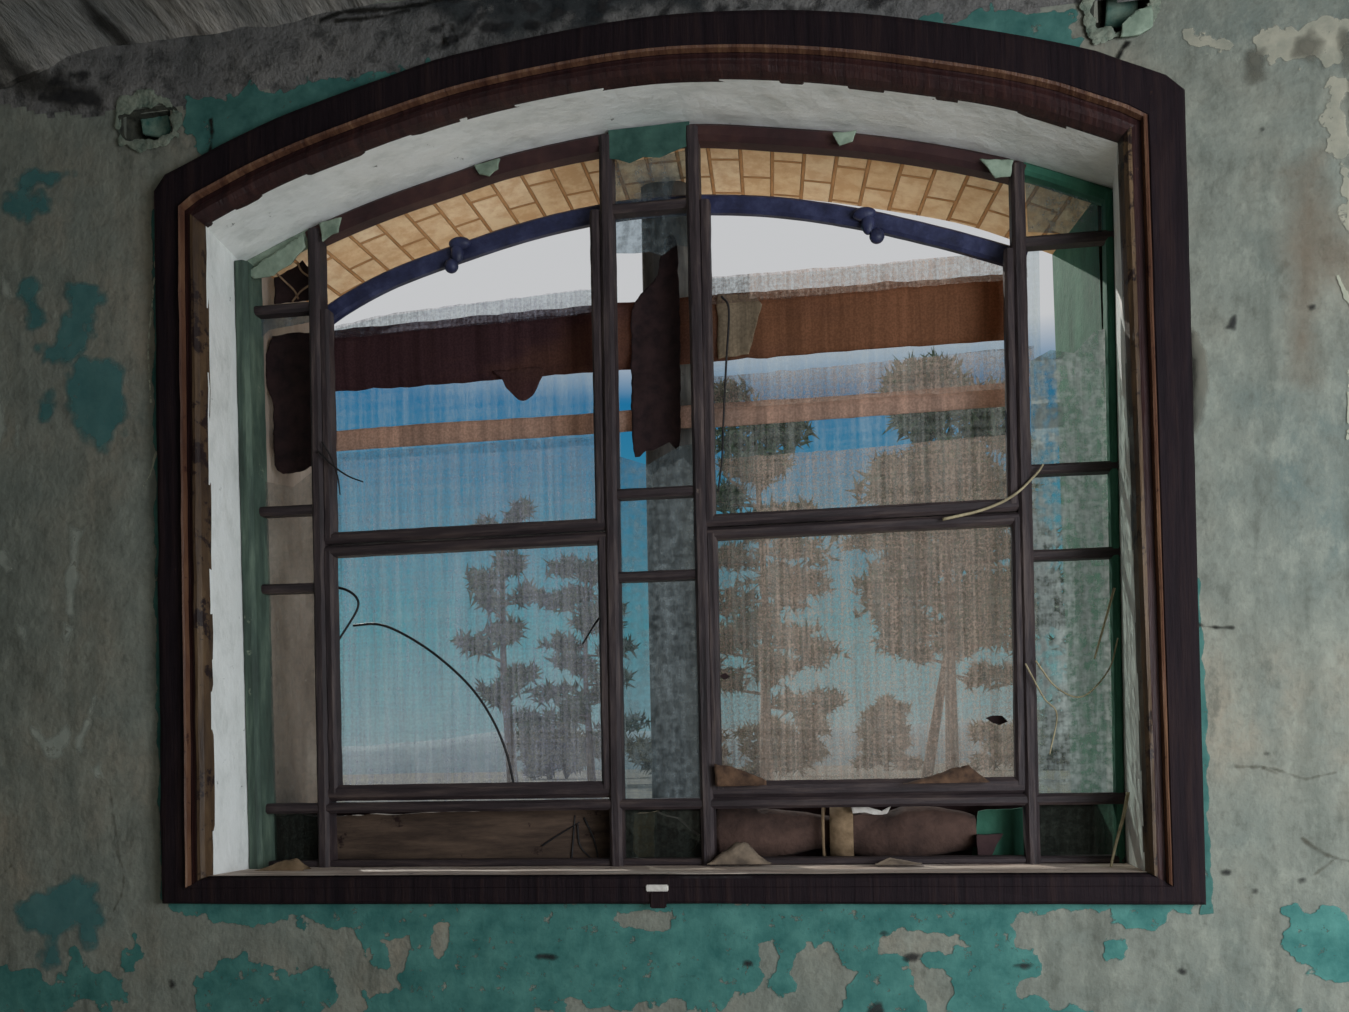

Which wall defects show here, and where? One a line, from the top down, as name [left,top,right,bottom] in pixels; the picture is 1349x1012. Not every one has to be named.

leakage [86,5,131,46]
leakage [430,0,653,37]
peeling [918,0,1161,47]
crack [1116,41,1131,59]
peeling [114,65,406,155]
peeling [1253,15,1349,231]
peeling [980,158,1014,178]
peeling [319,217,342,242]
peeling [35,283,125,449]
peeling [160,578,1231,1012]
peeling [0,877,144,1012]
peeling [1280,903,1349,983]